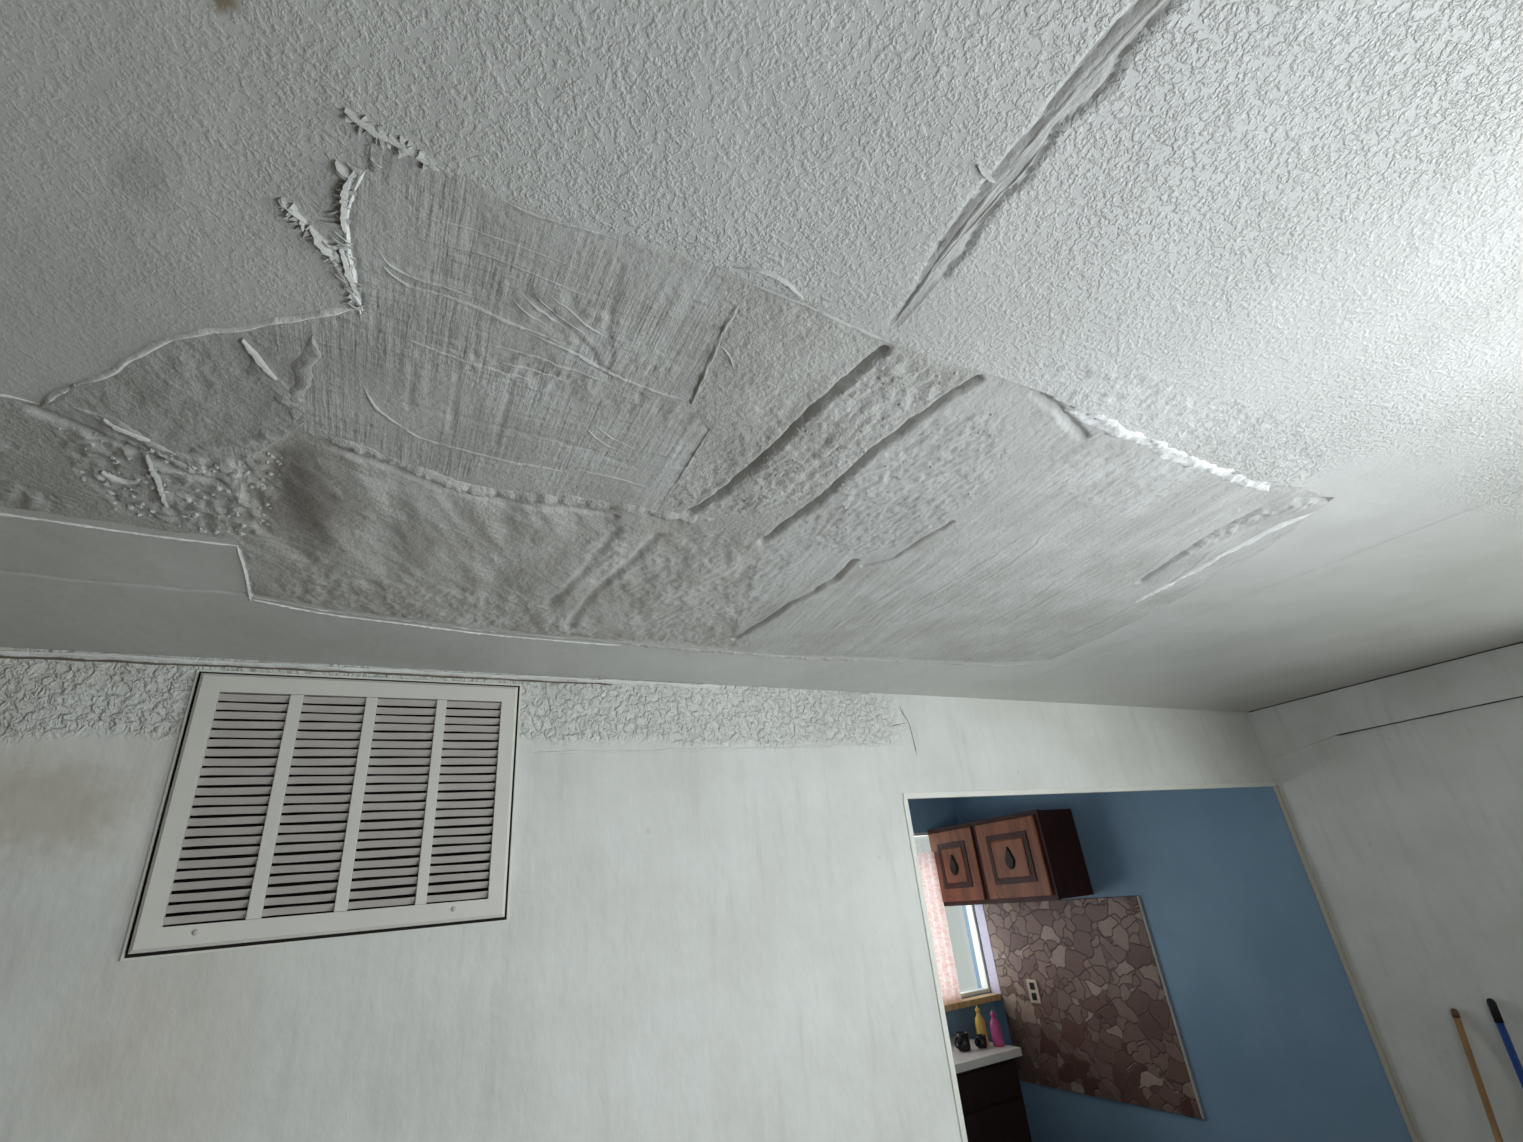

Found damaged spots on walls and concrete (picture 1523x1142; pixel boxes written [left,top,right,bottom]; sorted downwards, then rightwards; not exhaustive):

spalling [0,108,896,601]
crack [705,0,1171,541]
peeling [734,370,1336,666]
crack [1128,495,1336,606]